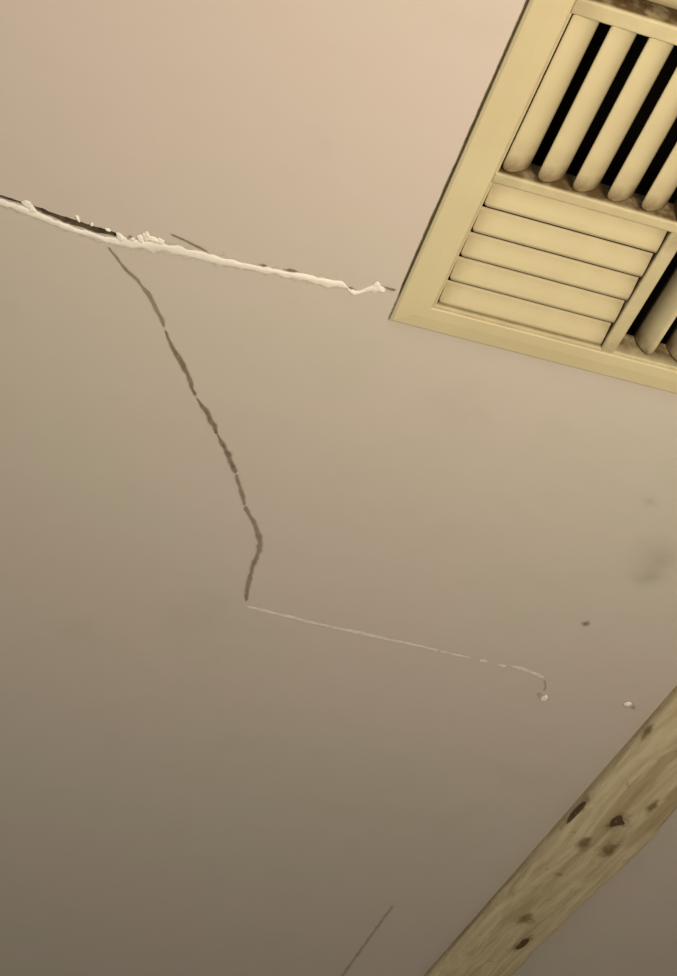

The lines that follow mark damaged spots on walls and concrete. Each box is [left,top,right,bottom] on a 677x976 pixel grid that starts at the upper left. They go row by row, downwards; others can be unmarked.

crack [0,195,544,678]